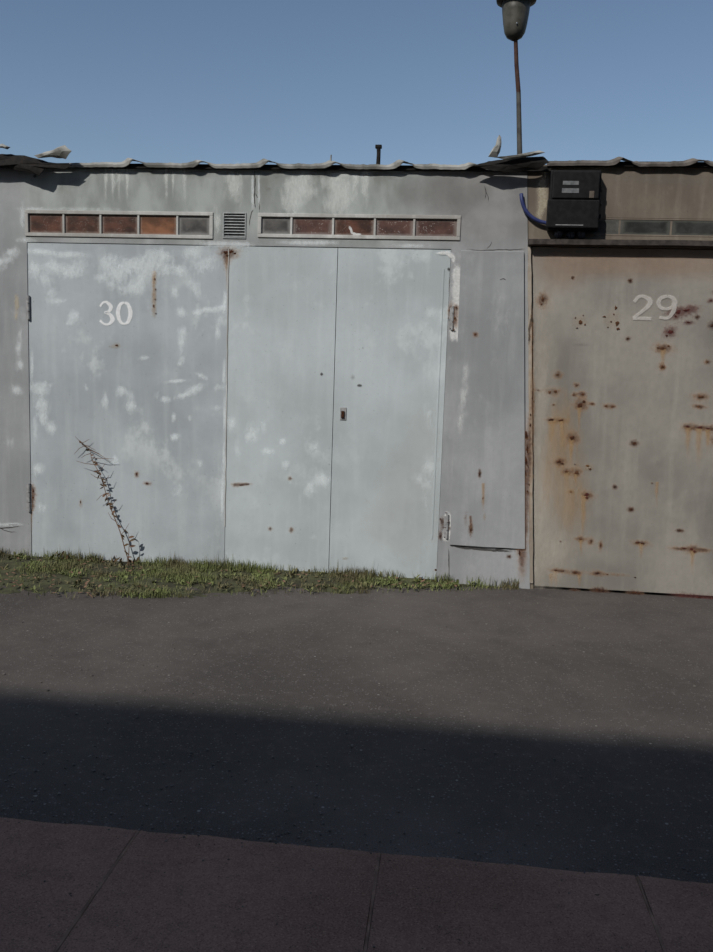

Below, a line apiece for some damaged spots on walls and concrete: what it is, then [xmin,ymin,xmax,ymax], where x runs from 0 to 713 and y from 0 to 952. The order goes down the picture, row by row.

corrosion [657,306,700,351]
corrosion [525,389,557,534]